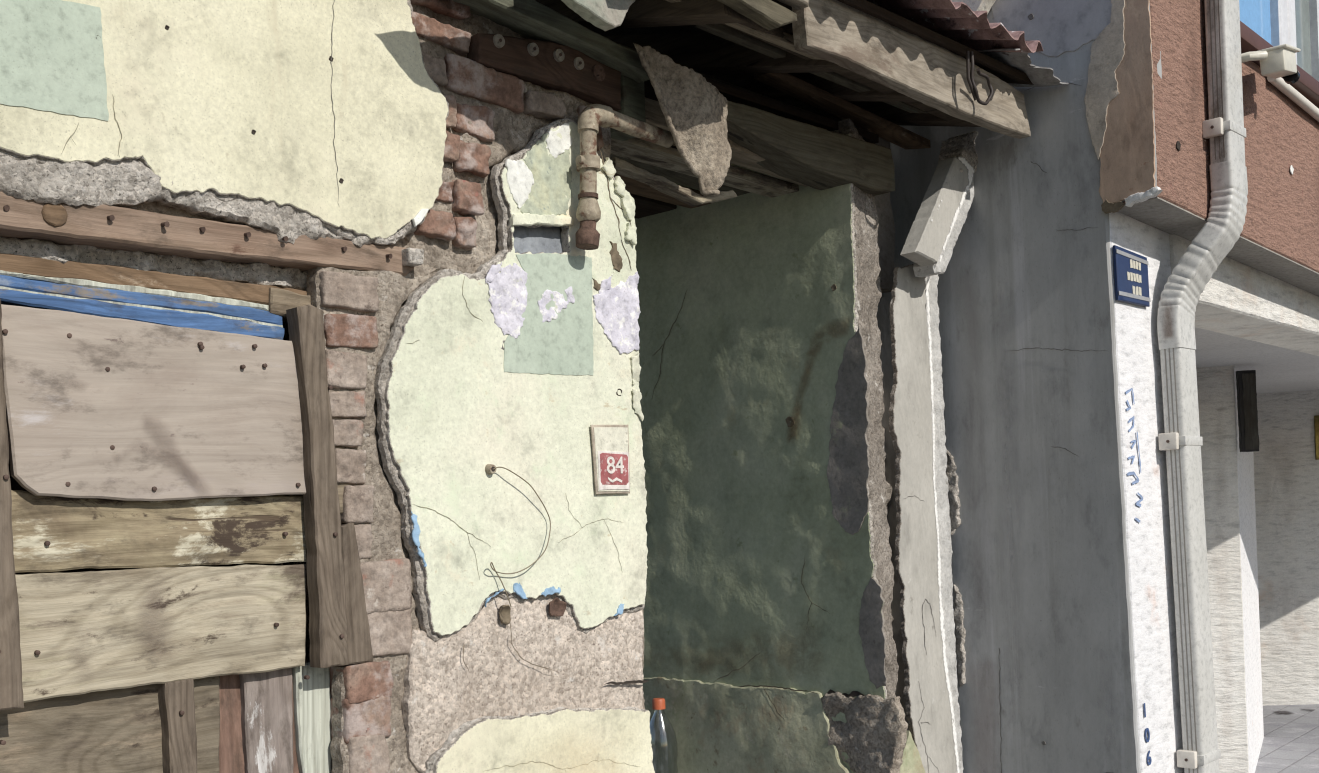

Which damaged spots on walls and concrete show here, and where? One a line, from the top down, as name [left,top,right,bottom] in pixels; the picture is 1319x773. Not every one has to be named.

peeling [991,0,1163,214]
flaking render [0,0,645,773]
peeling [827,327,870,535]
crack [882,426,924,509]
crack [717,650,814,719]
flaking render [821,576,908,773]
crack [891,599,939,773]
crack [996,648,1004,773]